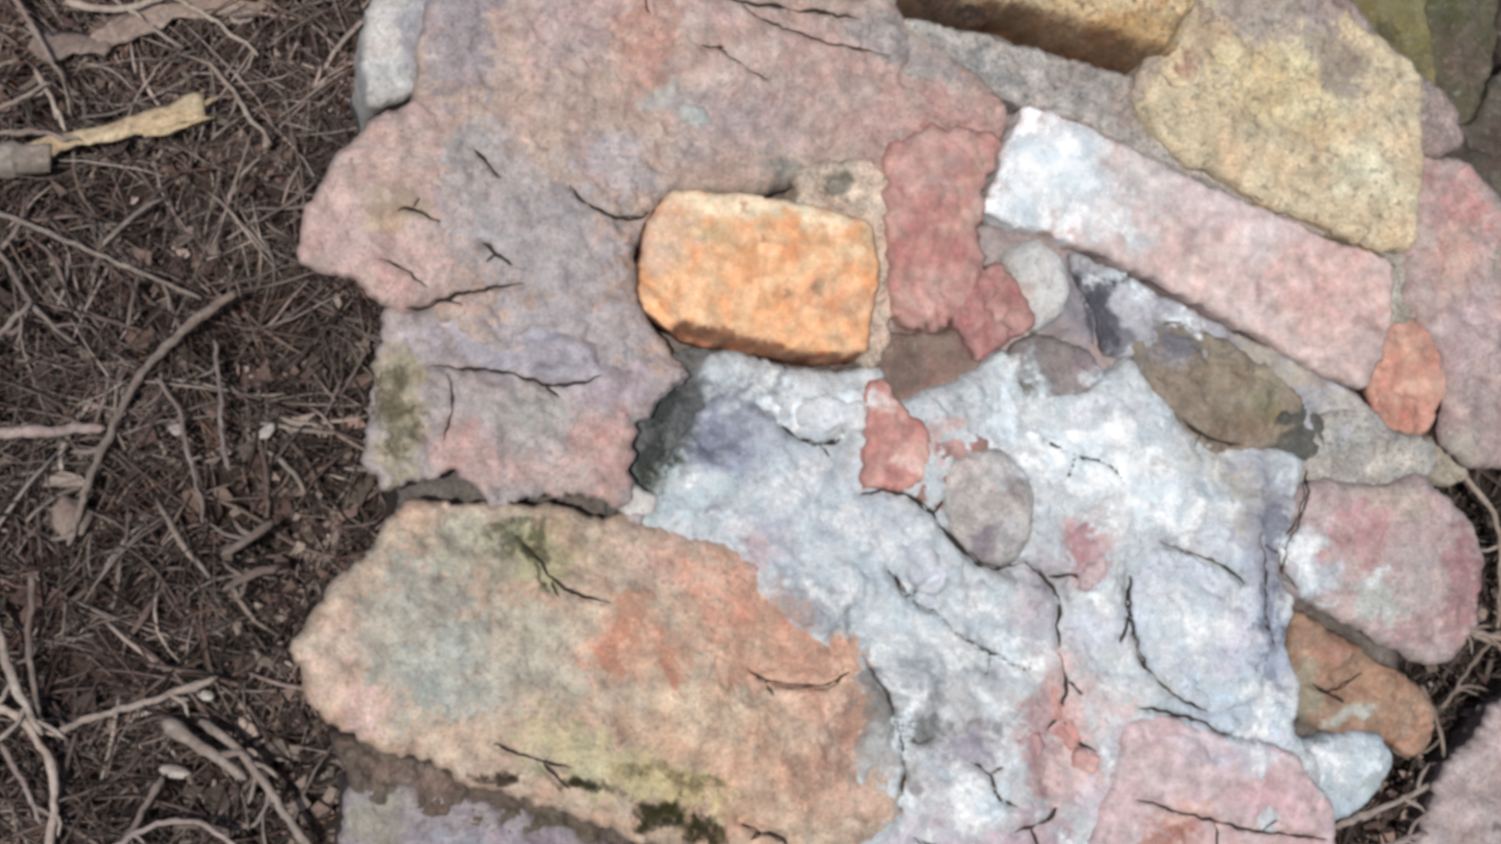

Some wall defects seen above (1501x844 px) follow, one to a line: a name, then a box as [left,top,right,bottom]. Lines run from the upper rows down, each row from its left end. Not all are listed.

crack [733,0,890,57]
crack [378,242,525,311]